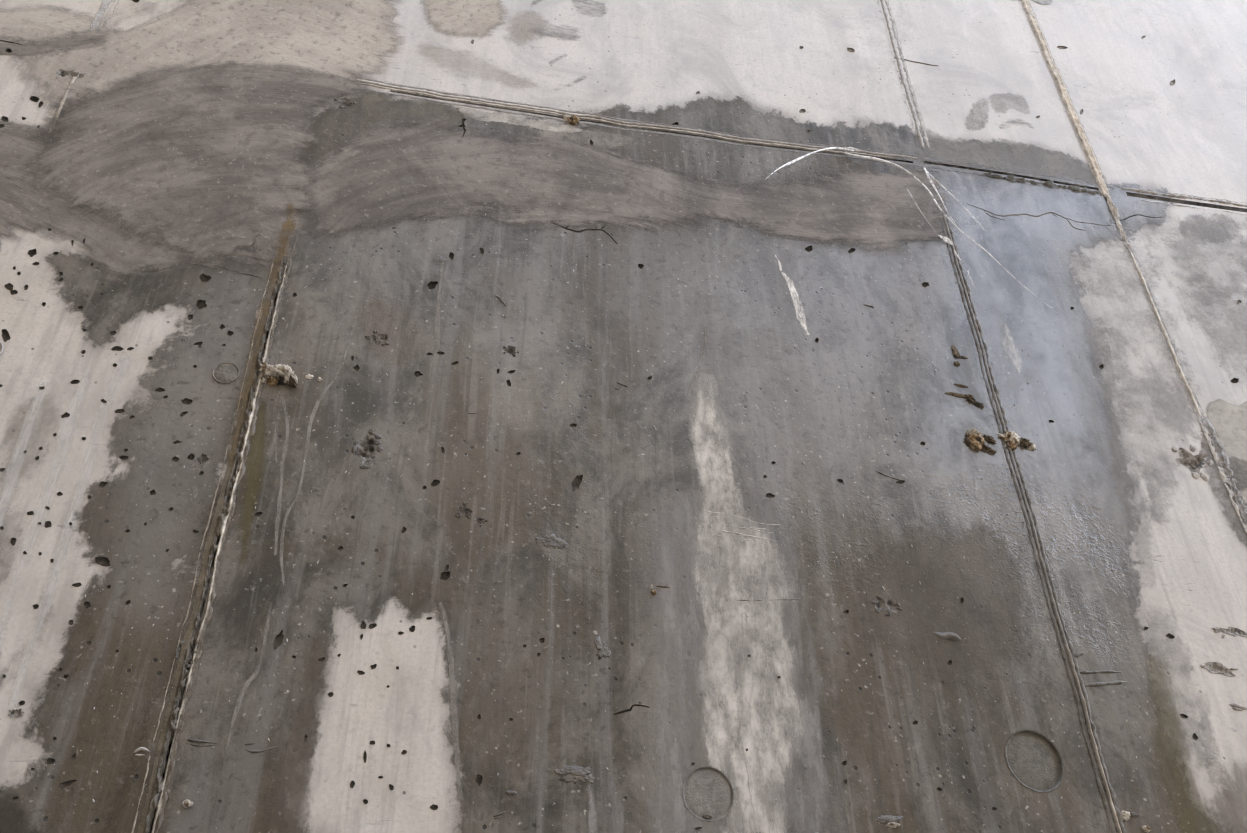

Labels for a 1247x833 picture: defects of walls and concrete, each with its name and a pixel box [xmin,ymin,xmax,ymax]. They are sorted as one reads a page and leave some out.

crack [968,204,1159,230]